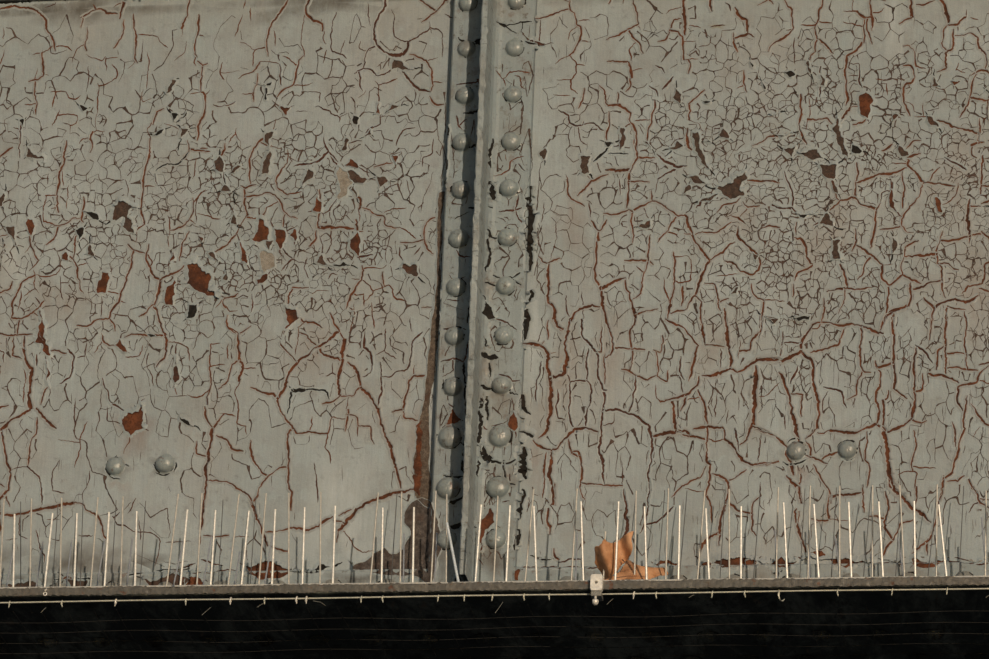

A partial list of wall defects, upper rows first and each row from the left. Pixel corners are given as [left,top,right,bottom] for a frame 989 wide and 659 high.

peeling [856,89,877,122]
peeling [644,123,751,203]
peeling [209,149,299,286]
peeling [162,233,231,321]
peeling [482,295,501,324]
crack [476,0,989,571]
peeling [118,399,149,438]
peeling [240,189,463,583]
rust [405,390,424,483]
peeling [480,347,501,364]
peeling [474,497,499,565]